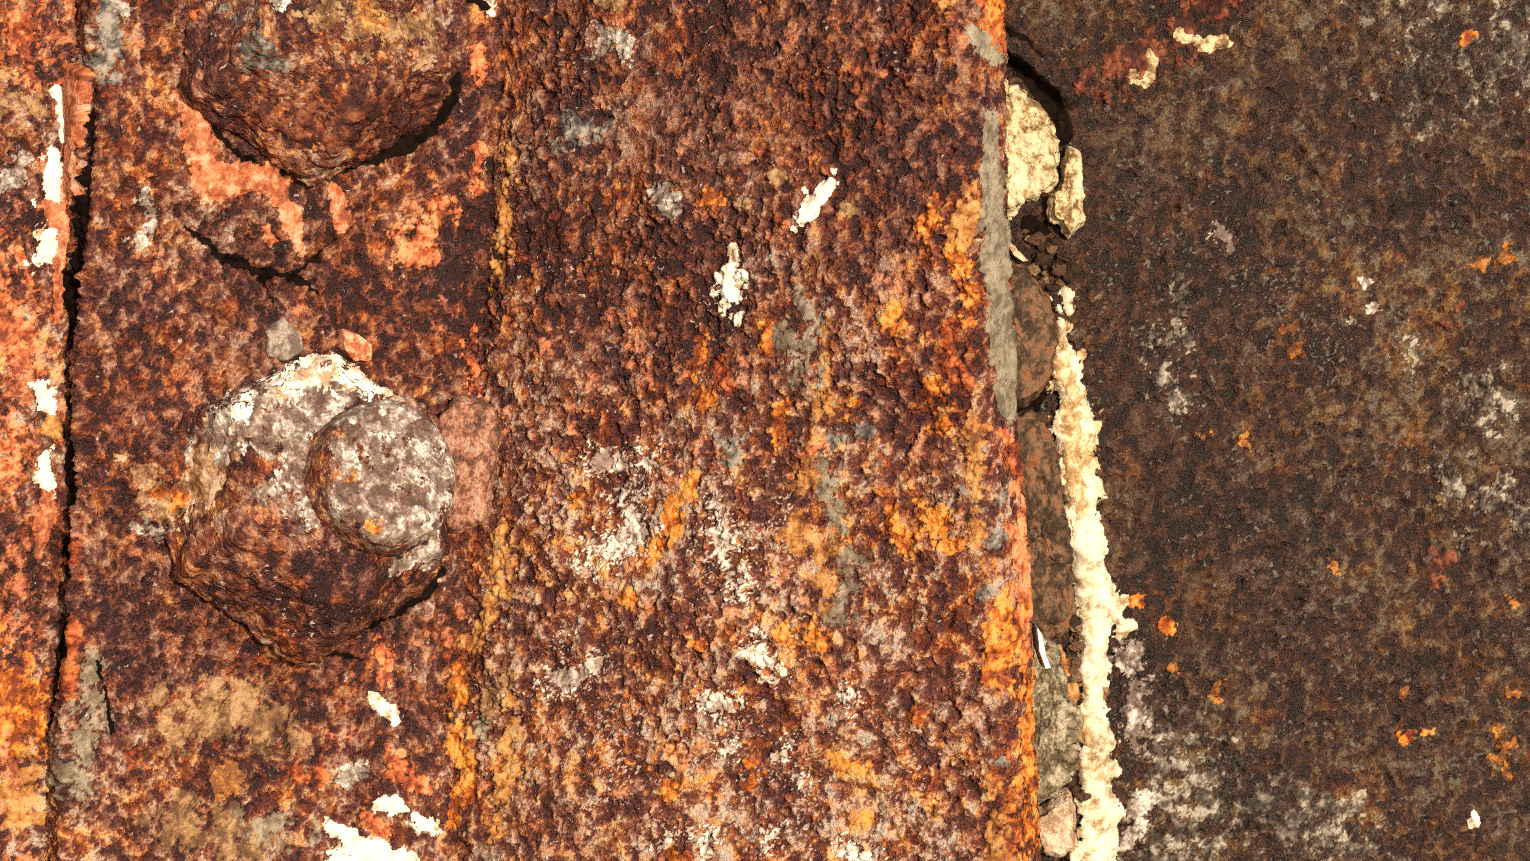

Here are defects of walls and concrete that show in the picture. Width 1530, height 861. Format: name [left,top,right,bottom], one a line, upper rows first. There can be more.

water stain [214,0,292,94]
corrosion [238,0,450,160]
corrosion [1073,0,1245,112]
corrosion [0,0,96,382]
corrosion [170,88,306,257]
corrosion [327,181,355,234]
corrosion [383,135,520,296]
corrosion [112,382,252,543]
corrosion [333,323,525,844]
corrosion [873,178,1051,861]
water stain [1047,321,1108,541]
corrosion [0,610,53,769]